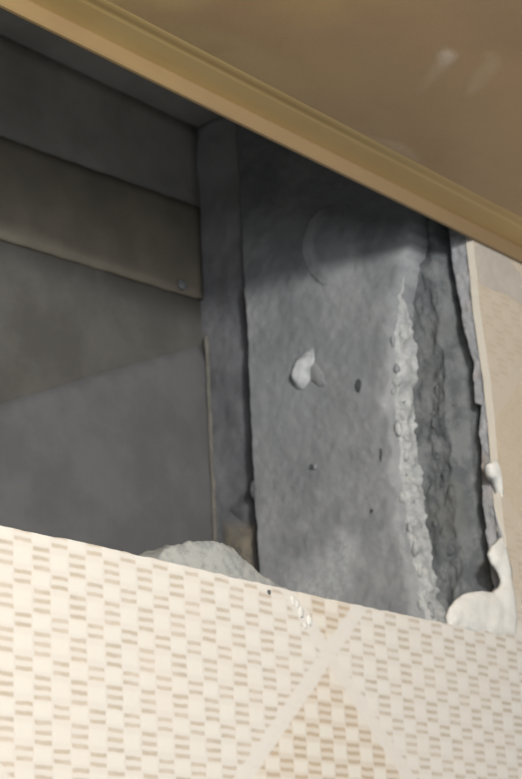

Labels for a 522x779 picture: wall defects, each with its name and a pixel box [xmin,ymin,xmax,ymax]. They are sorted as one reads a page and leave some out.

flaking render [291,347,327,389]
spalling [390,216,503,624]